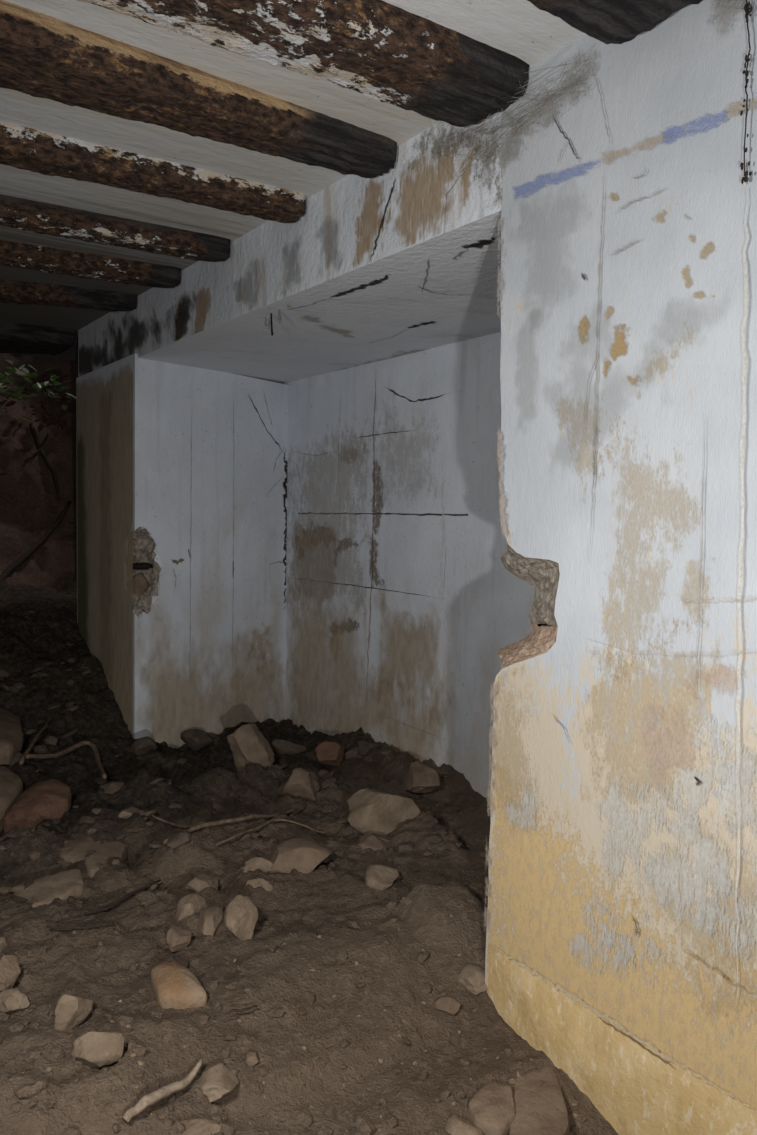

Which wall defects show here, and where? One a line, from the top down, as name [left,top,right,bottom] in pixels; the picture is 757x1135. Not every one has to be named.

crack [330,178,396,298]
peeling [682,268,704,298]
peeling [690,236,714,258]
spalling [133,525,161,617]
damp [295,521,359,567]
crack [248,382,468,732]
spalling [495,431,560,670]
damp [152,631,276,748]
damp [292,607,439,758]
damp [486,762,757,1110]